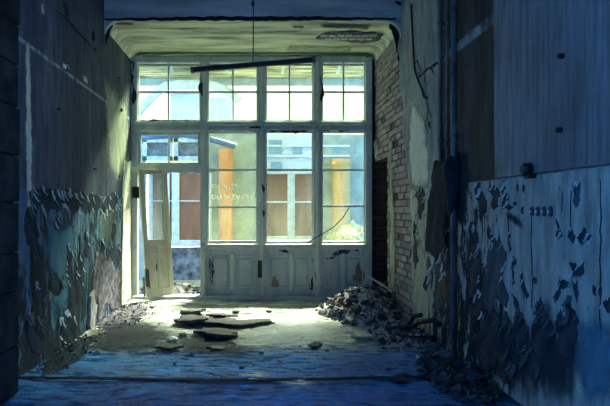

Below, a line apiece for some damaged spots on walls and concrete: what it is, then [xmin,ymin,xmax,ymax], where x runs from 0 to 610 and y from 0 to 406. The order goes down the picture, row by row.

crack [418,56,444,134]
peeling [24,186,126,347]
flaking render [316,24,448,321]
peeling [473,180,524,214]
peeling [465,221,585,380]
peeling [555,218,592,245]
peeling [571,181,581,208]
peeling [591,284,610,313]